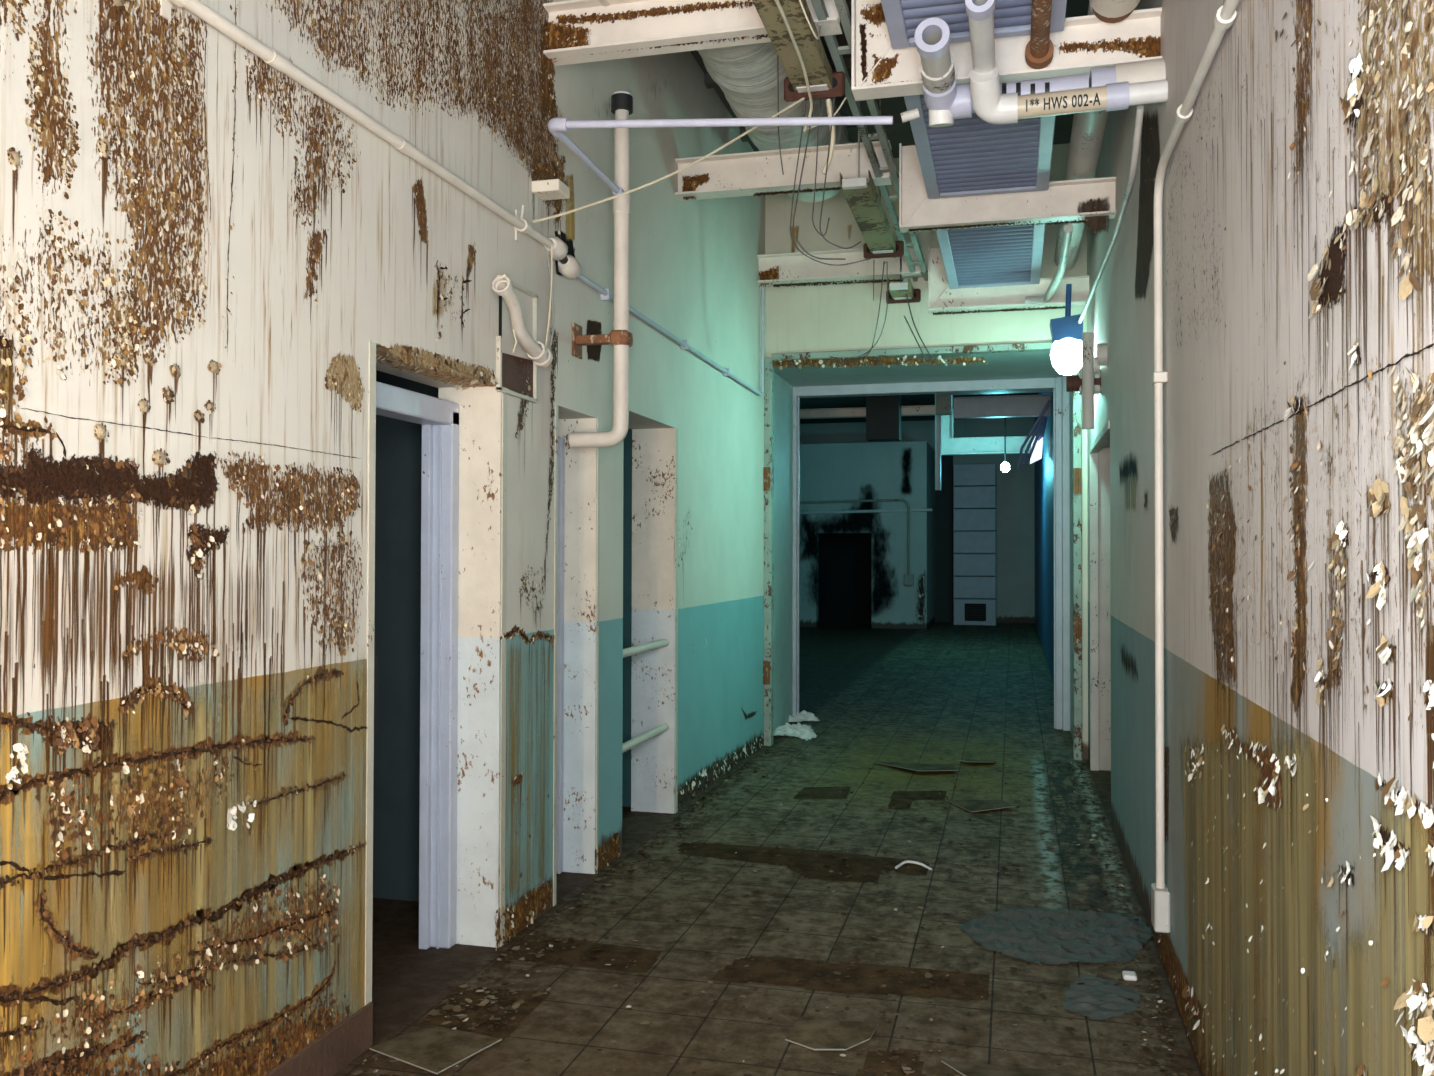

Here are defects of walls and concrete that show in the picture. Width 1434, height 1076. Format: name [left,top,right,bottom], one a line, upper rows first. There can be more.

rust [859,2,922,85]
peeling [0,0,211,419]
rust [0,336,56,470]
crack [1212,343,1434,455]
spalling [0,446,219,634]
peeling [1164,0,1434,1076]
peeling [5,743,29,789]
rust [0,872,352,1076]
crack [0,665,367,1076]
peeling [227,794,256,836]
rust [494,876,553,951]
rust [1153,929,1224,1076]